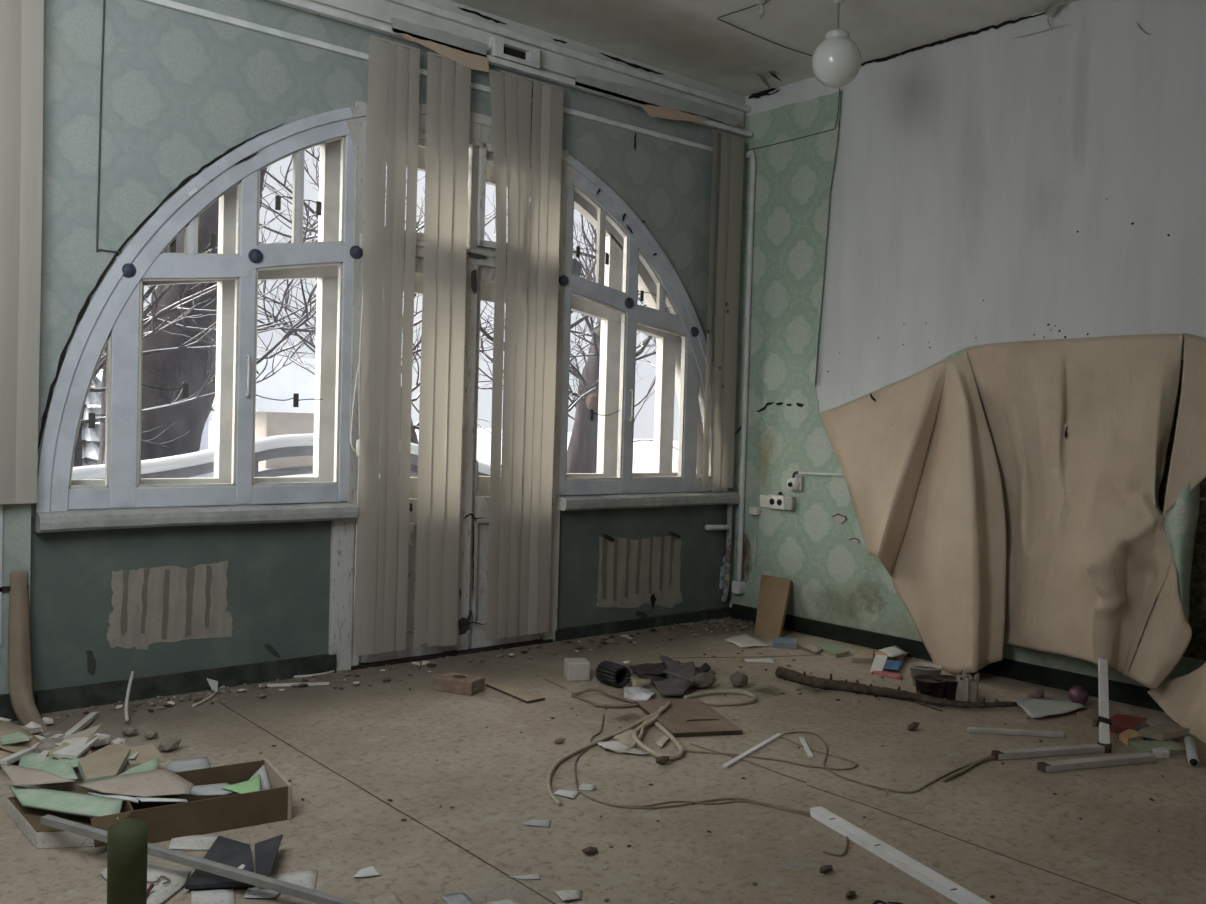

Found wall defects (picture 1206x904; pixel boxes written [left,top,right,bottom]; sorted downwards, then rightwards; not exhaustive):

crack [458,7,506,24]
crack [599,52,664,75]
crack [861,13,1069,66]
crack [748,88,780,99]
flaking render [596,536,682,618]
flaking render [106,561,233,652]